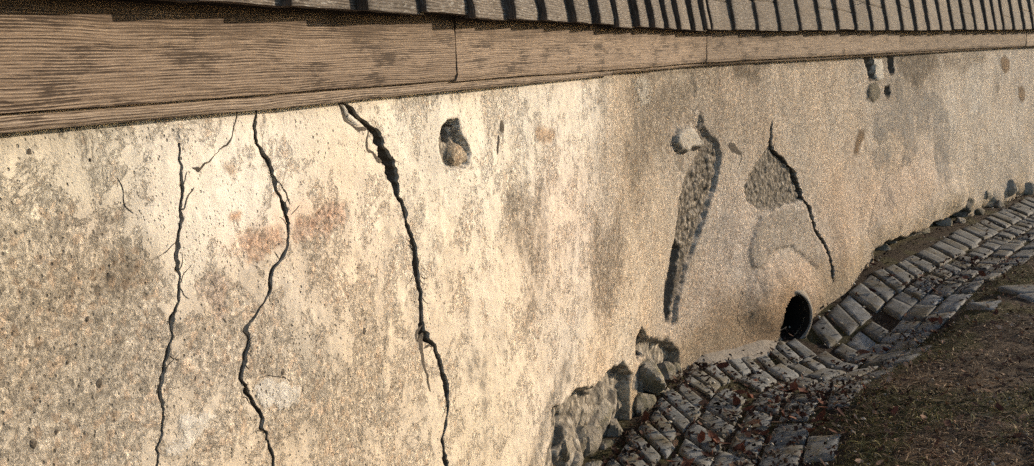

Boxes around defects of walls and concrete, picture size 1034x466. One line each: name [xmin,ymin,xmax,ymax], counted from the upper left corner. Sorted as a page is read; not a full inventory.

spalling [438,124,469,168]
spalling [627,81,715,323]
crack [729,143,742,168]
spalling [744,147,798,211]
crack [768,124,835,279]
crack [155,110,300,466]
crack [338,102,450,466]
spalling [544,330,679,466]